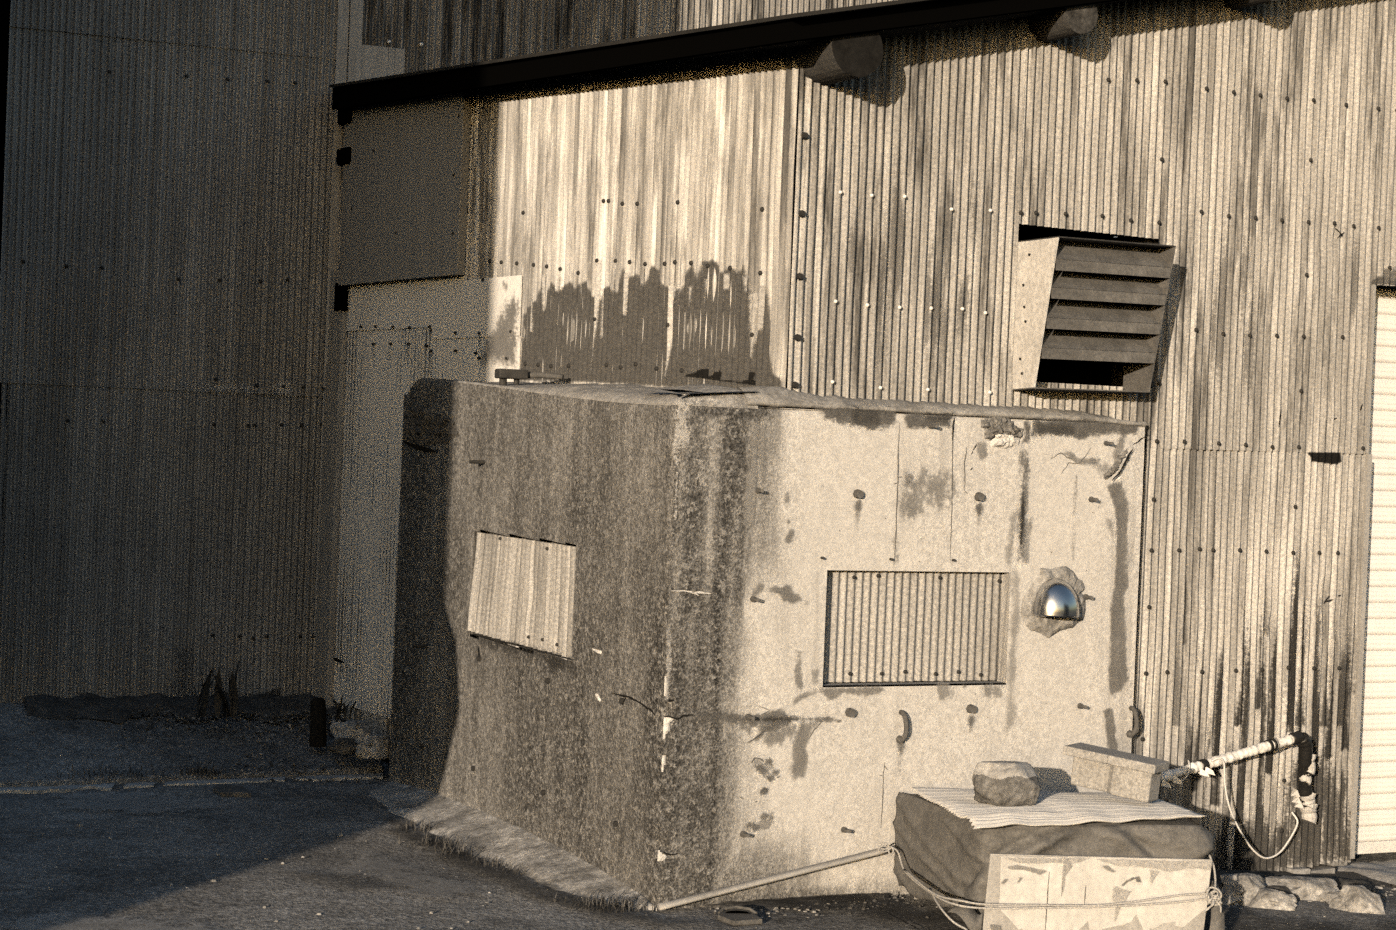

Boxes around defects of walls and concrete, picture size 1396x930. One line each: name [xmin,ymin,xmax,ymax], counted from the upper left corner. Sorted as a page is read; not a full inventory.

water stain [1211,226,1254,392]
water stain [1351,254,1359,313]
spalling [403,407,460,453]
spalling [970,417,1024,470]
water stain [1103,481,1128,750]
water stain [695,652,883,776]